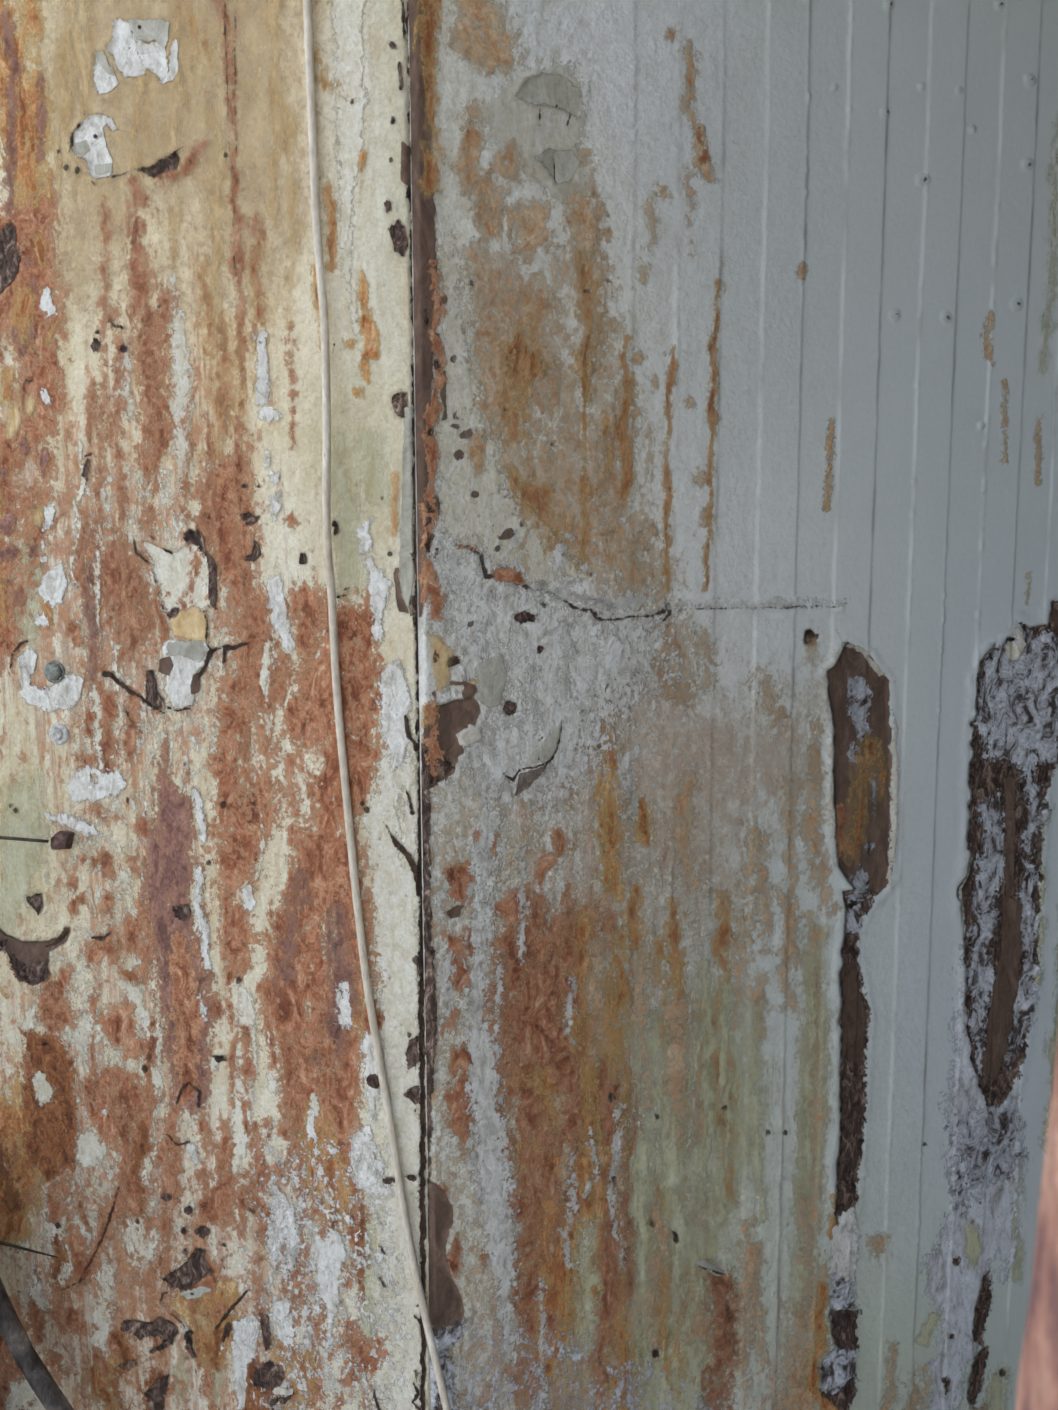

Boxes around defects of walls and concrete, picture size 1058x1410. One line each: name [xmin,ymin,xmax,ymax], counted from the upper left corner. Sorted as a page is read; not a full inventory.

peeling [93,19,178,94]
peeling [57,113,228,198]
rust [450,99,721,708]
peeling [34,440,217,712]
rust [0,0,398,1410]
spalling [375,621,486,789]
crack [386,0,836,1410]
rust [752,668,788,726]
spalling [0,927,69,986]
spalling [815,642,900,1410]
spalling [958,600,1058,1107]
spalling [86,1134,248,1371]